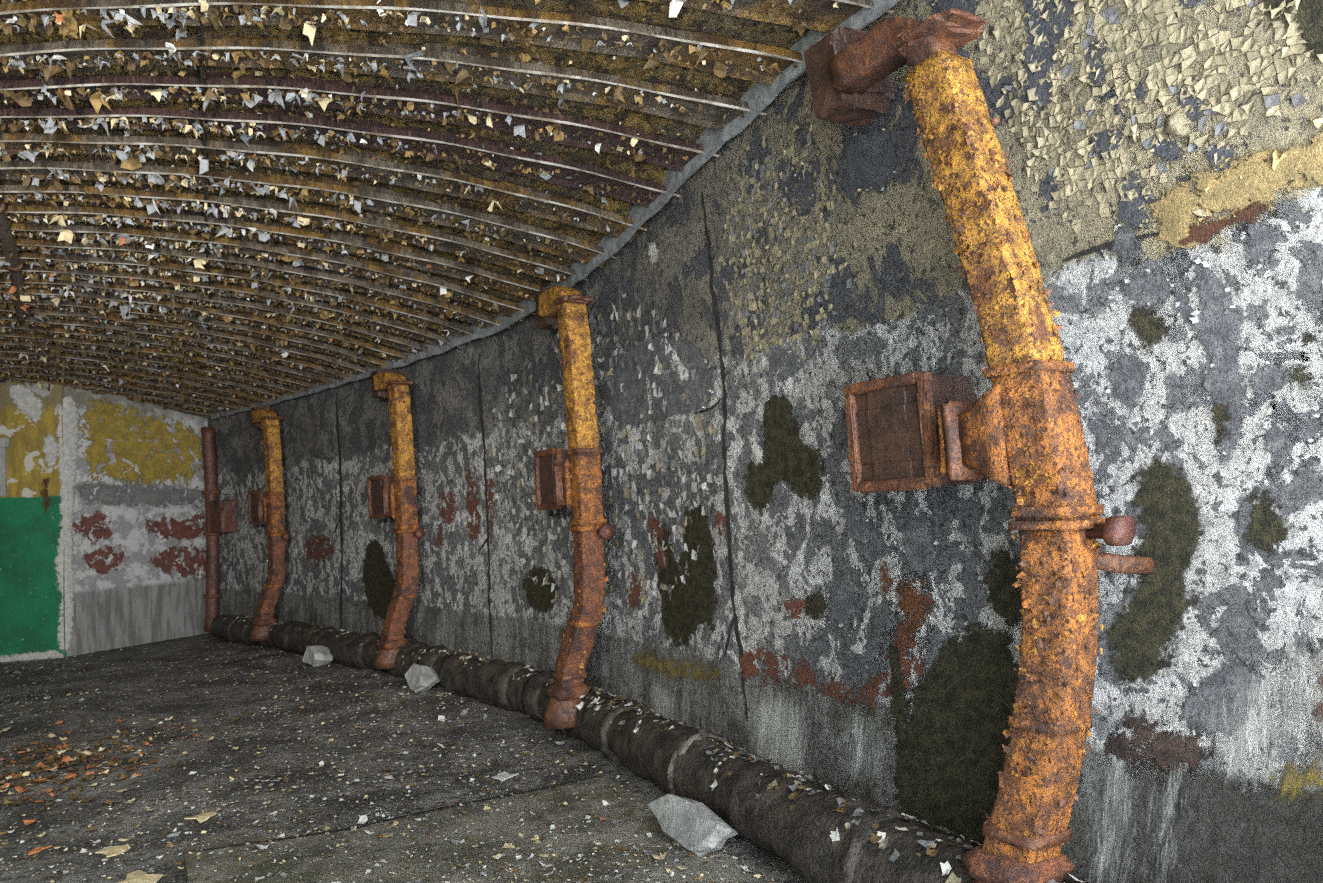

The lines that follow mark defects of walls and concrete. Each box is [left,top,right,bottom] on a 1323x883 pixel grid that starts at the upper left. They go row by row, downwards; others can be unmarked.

peeling [768,0,832,37]
peeling [718,125,851,382]
peeling [932,0,1323,463]
peeling [0,0,798,662]
leakage [742,394,826,520]
leakage [362,540,396,619]
leakage [522,566,558,613]
leakage [653,504,720,647]
leakage [1103,453,1205,683]
leakage [888,542,1022,843]
rust [1314,674,1323,734]
rust [1273,761,1323,804]